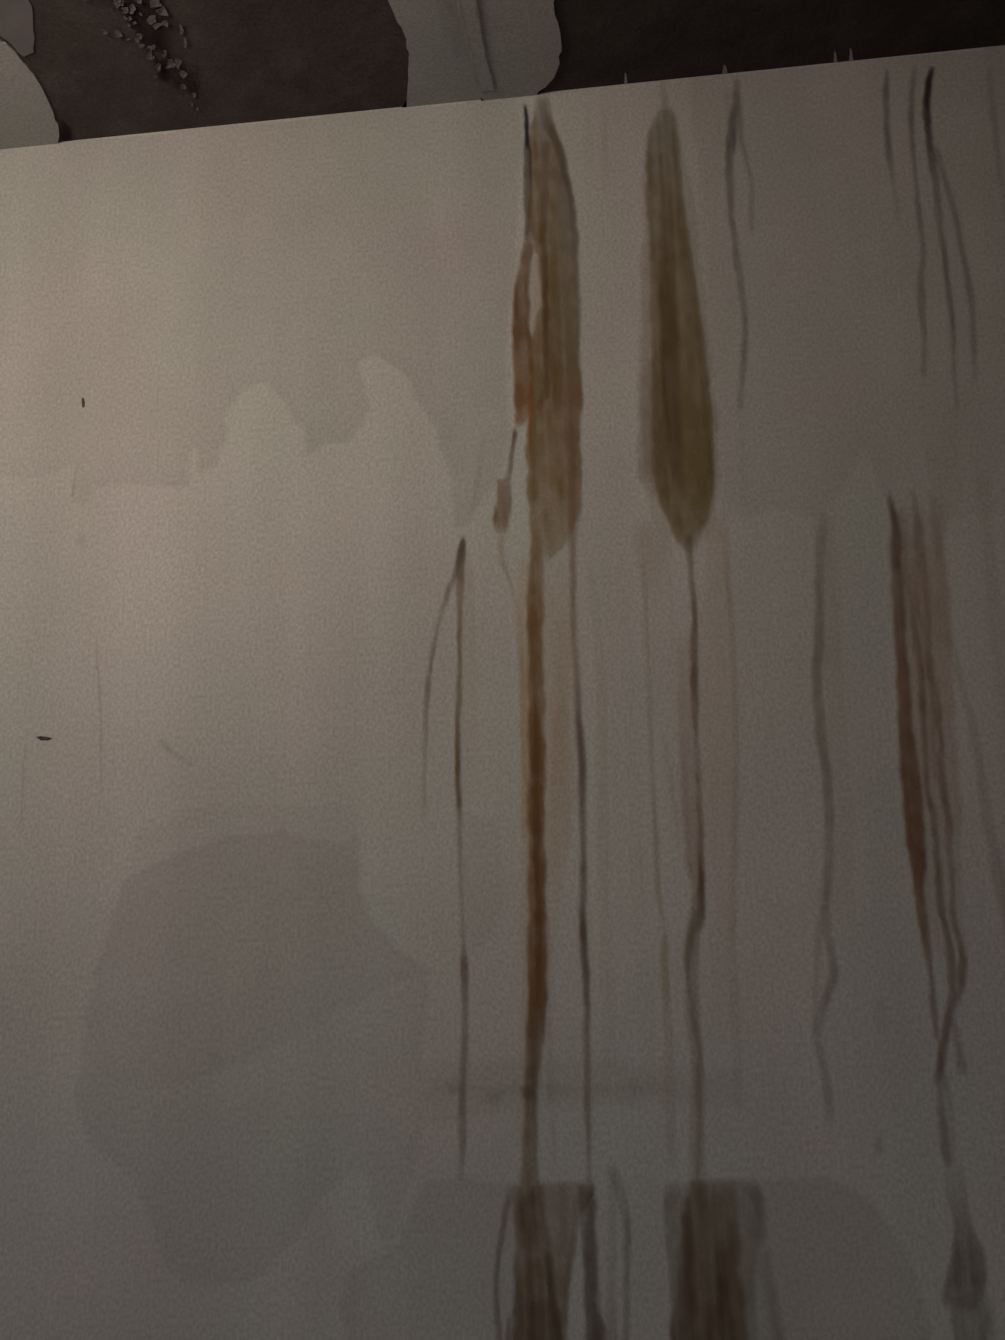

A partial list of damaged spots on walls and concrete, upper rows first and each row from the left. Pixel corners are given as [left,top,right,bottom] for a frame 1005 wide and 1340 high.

damp [923,69,932,159]
rust [510,106,582,530]
rust [647,124,712,550]
rust [890,506,900,572]
rust [526,559,546,1108]
rust [576,714,584,806]
rust [898,603,938,942]
rust [579,904,587,1005]
rust [512,1173,562,1340]